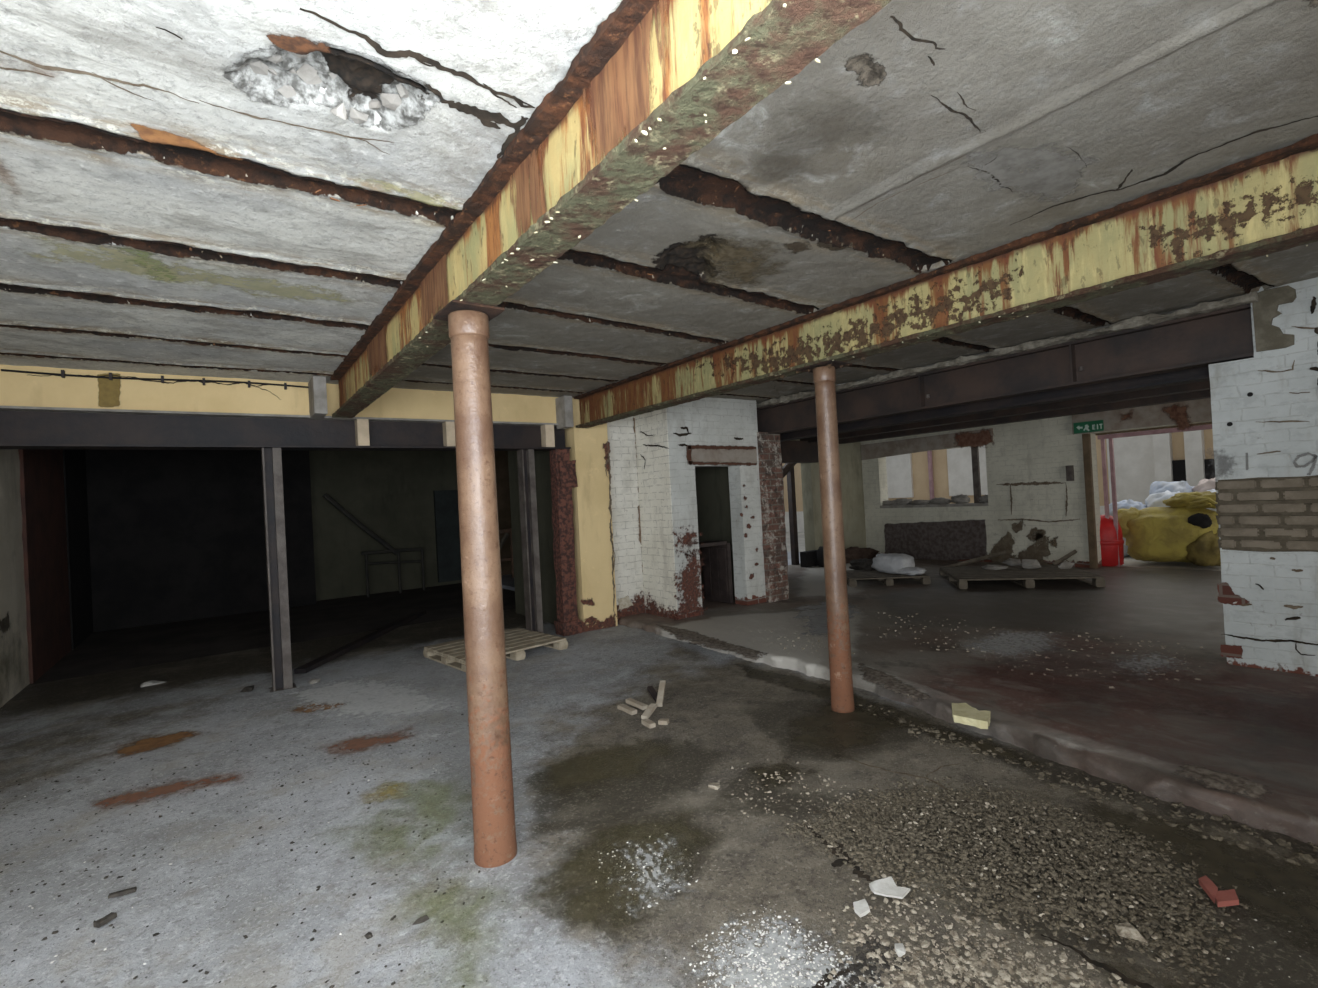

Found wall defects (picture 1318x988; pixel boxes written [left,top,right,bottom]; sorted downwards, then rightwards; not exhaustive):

crack [0,50,393,155]
spalling [224,34,440,131]
crack [299,8,535,159]
corrosion [583,0,667,164]
crack [834,16,1318,225]
leakage [652,234,853,286]
corrosion [488,164,1024,385]
corrosion [1139,176,1318,294]
peeling [570,525,767,660]
peeling [1216,582,1249,605]
leakage [539,818,708,925]
leakage [704,918,852,988]